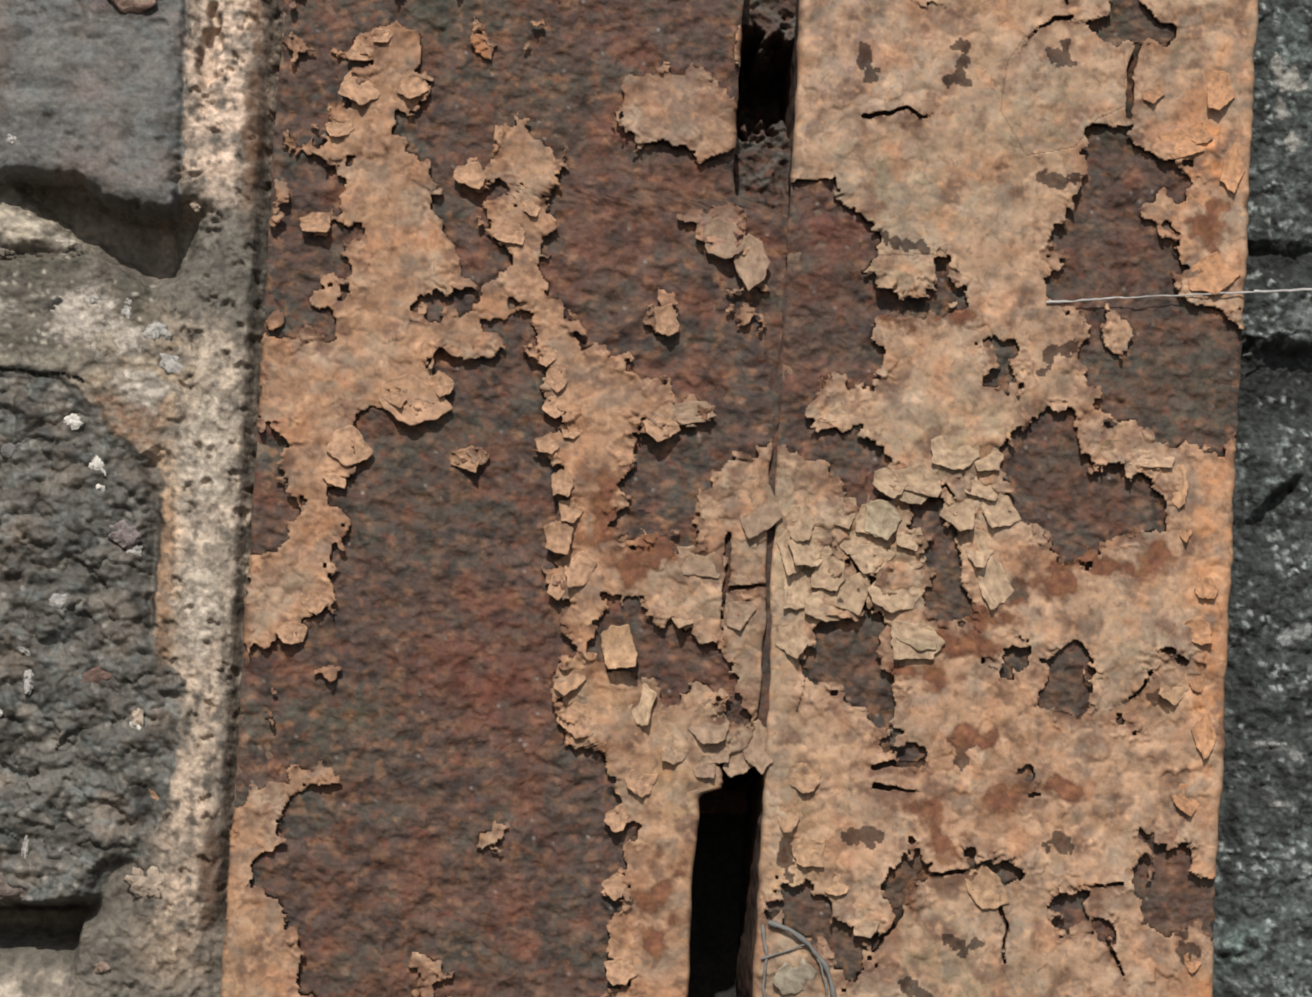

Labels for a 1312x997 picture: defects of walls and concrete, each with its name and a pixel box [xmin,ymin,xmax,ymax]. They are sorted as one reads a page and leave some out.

crack [861,105,928,119]
crack [1125,42,1142,119]
corrosion [232,0,1245,997]